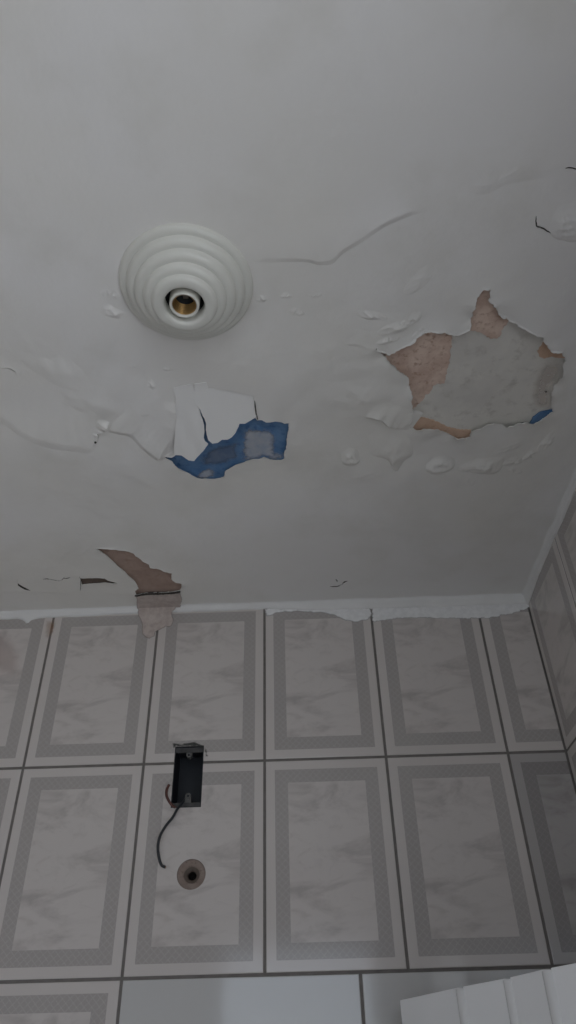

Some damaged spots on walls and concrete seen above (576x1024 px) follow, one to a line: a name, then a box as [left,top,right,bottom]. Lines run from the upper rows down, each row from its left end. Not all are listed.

peeling [374,287,567,440]
peeling [164,382,291,480]
peeling [94,547,183,638]